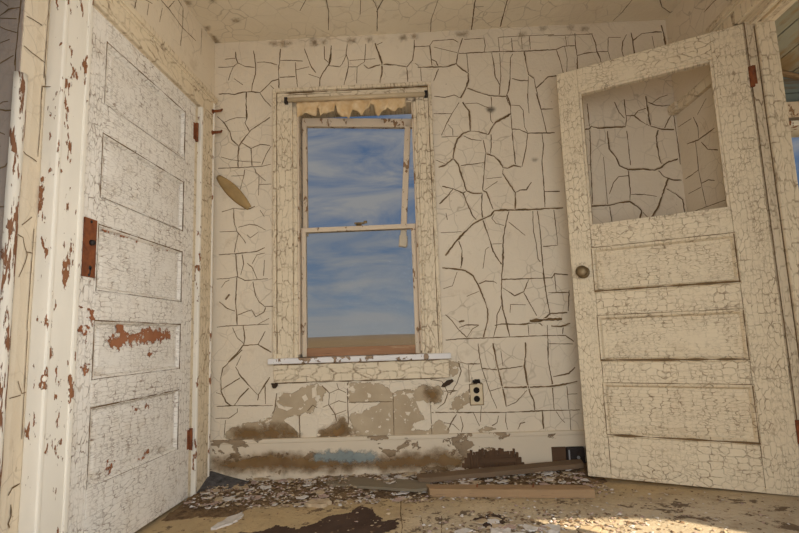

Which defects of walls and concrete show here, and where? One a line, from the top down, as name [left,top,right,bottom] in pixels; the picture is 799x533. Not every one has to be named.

crack [0,0,51,169]
crack [134,0,202,46]
crack [215,0,671,438]
crack [585,95,725,222]
crack [9,217,34,433]
peeling [105,324,171,358]
peeling [225,359,486,440]
crack [8,483,20,528]